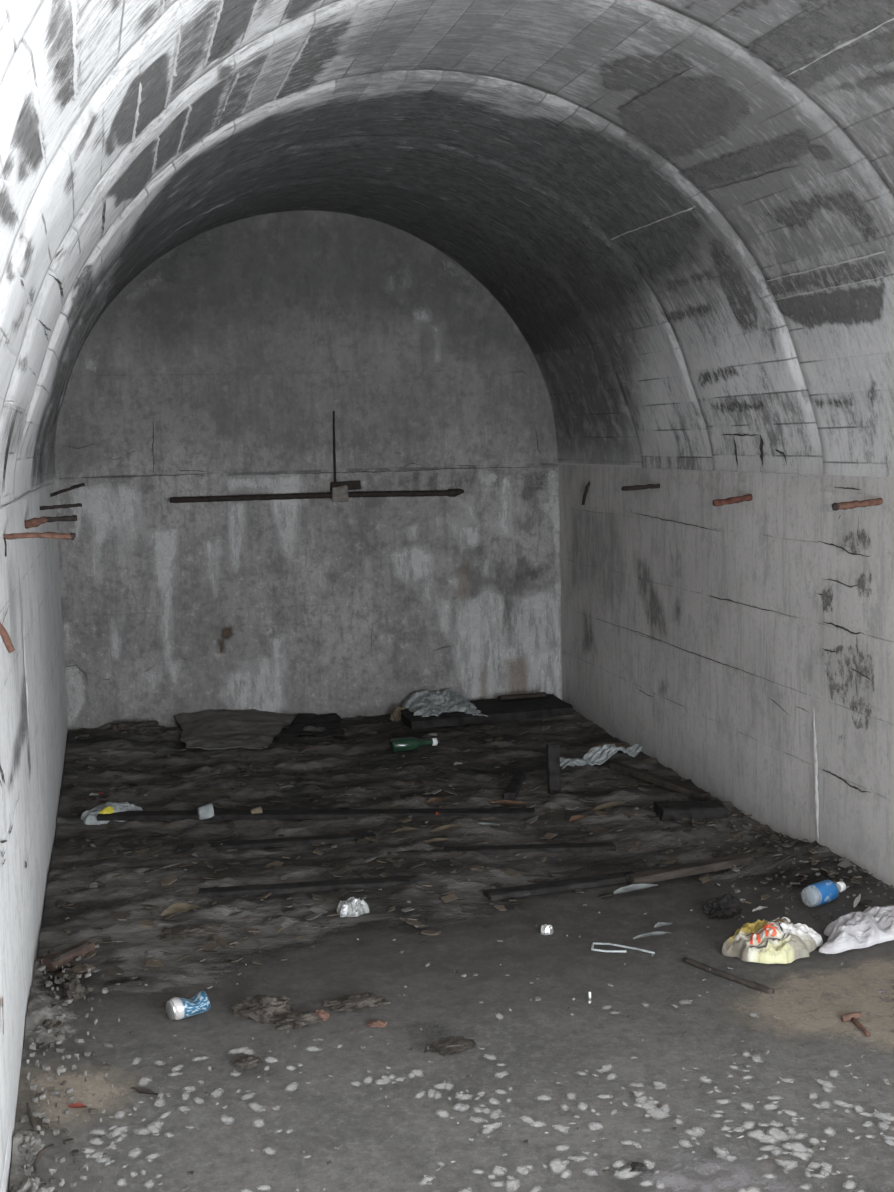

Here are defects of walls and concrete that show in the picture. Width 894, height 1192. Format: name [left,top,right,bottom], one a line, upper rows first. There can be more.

rust [24,516,47,529]
water stain [229,504,244,563]
water stain [229,476,301,554]
water stain [394,527,431,597]
water stain [227,639,283,712]